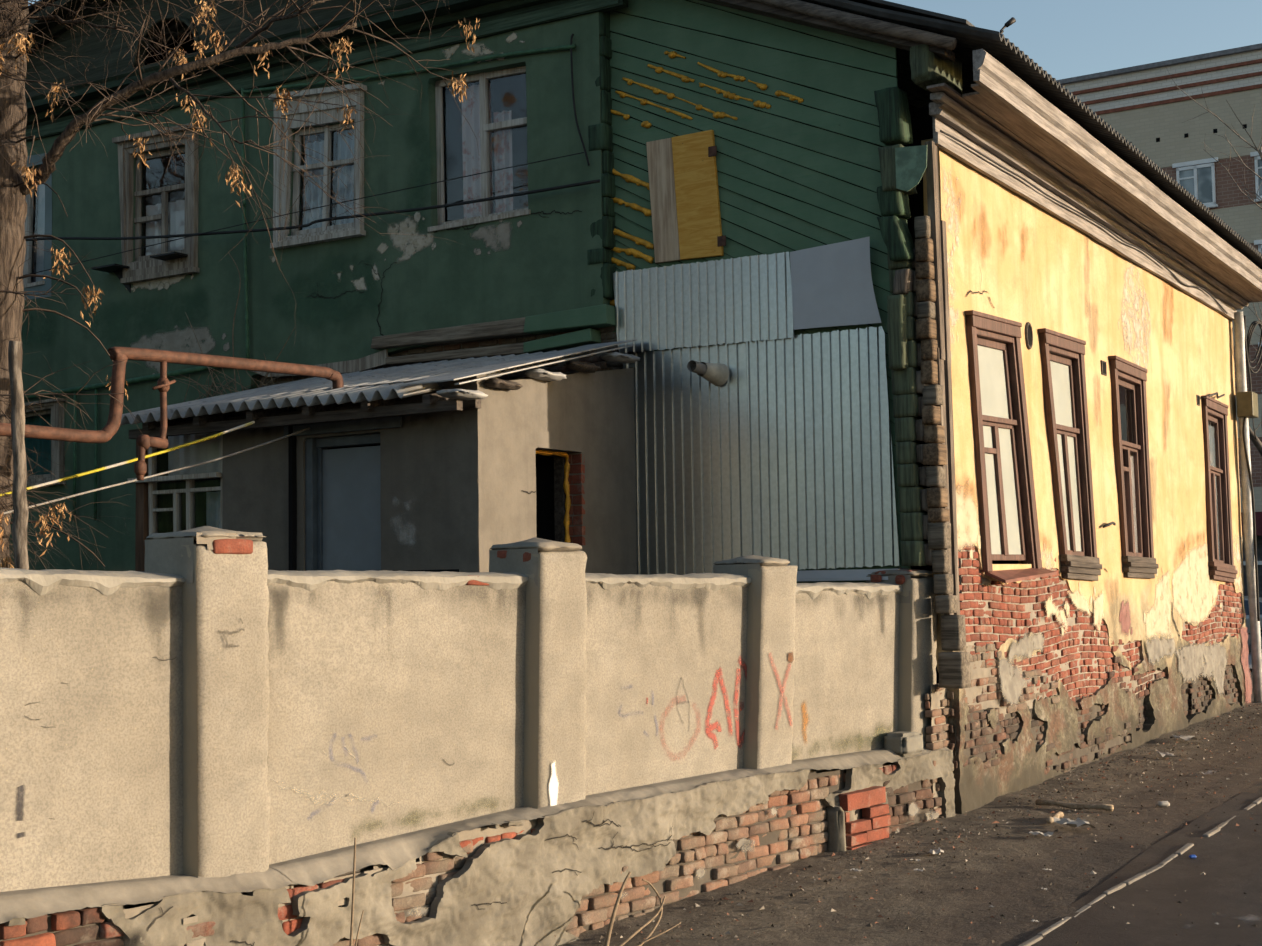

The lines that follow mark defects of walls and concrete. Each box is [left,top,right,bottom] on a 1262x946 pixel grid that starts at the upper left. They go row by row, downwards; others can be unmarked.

peeling [444,33,525,63]
peeling [338,212,436,290]
peeling [472,219,522,255]
peeling [131,325,230,375]
spalling [946,480,1252,774]
spalling [278,819,538,935]
crack [545,813,673,875]
spalling [554,769,846,937]
spalling [0,904,154,946]
spalling [183,916,216,946]
spalling [333,933,393,946]